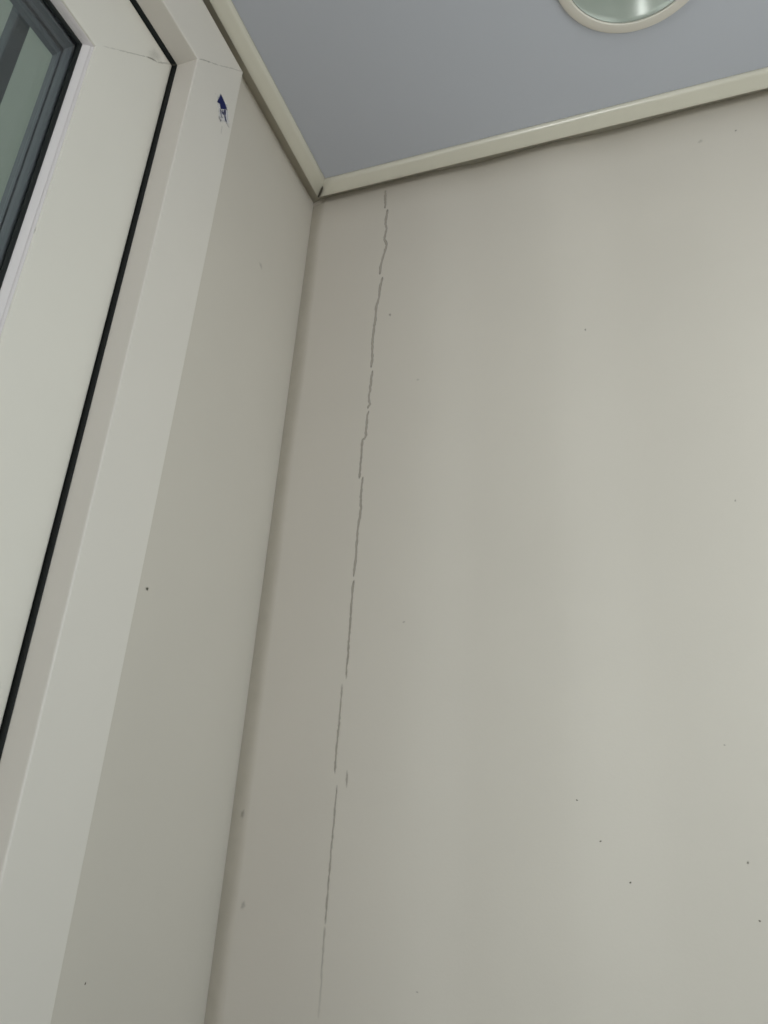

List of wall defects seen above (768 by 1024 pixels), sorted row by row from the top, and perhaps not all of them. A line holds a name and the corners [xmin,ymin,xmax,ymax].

crack [346,191,388,674]
crack [333,704,341,770]